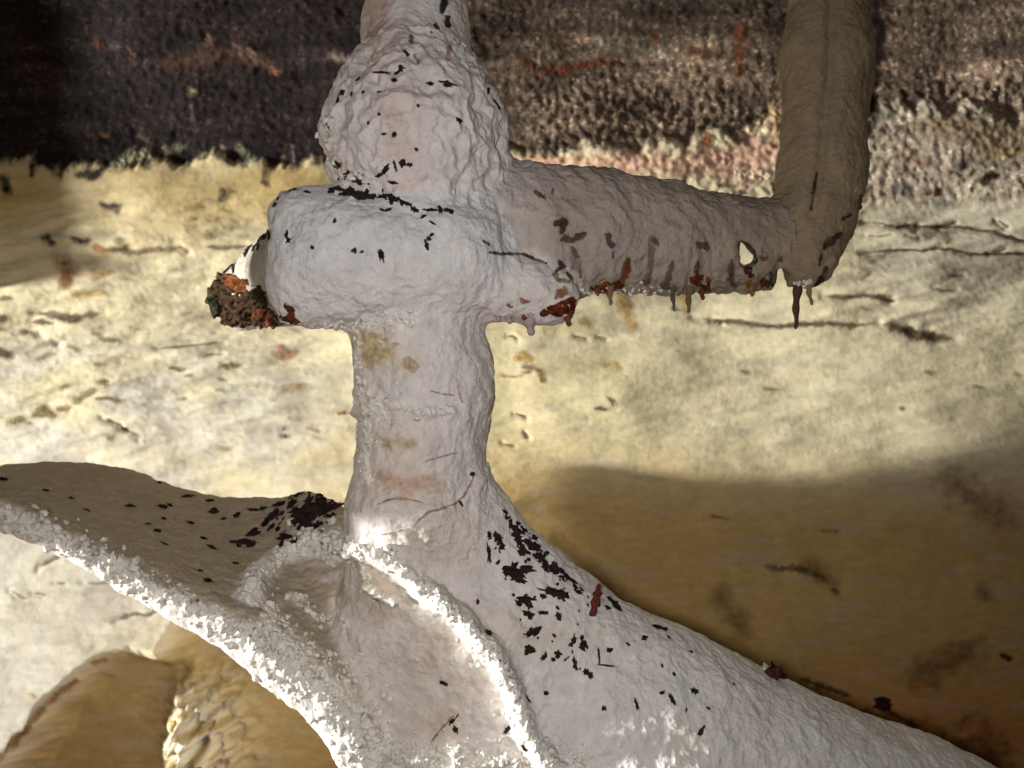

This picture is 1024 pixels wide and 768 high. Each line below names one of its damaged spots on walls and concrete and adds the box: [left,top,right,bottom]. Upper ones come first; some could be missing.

corrosion [204,272,301,330]
corrosion [539,272,577,320]
corrosion [588,258,631,293]
corrosion [642,238,674,290]
corrosion [689,242,711,294]
corrosion [726,256,774,294]